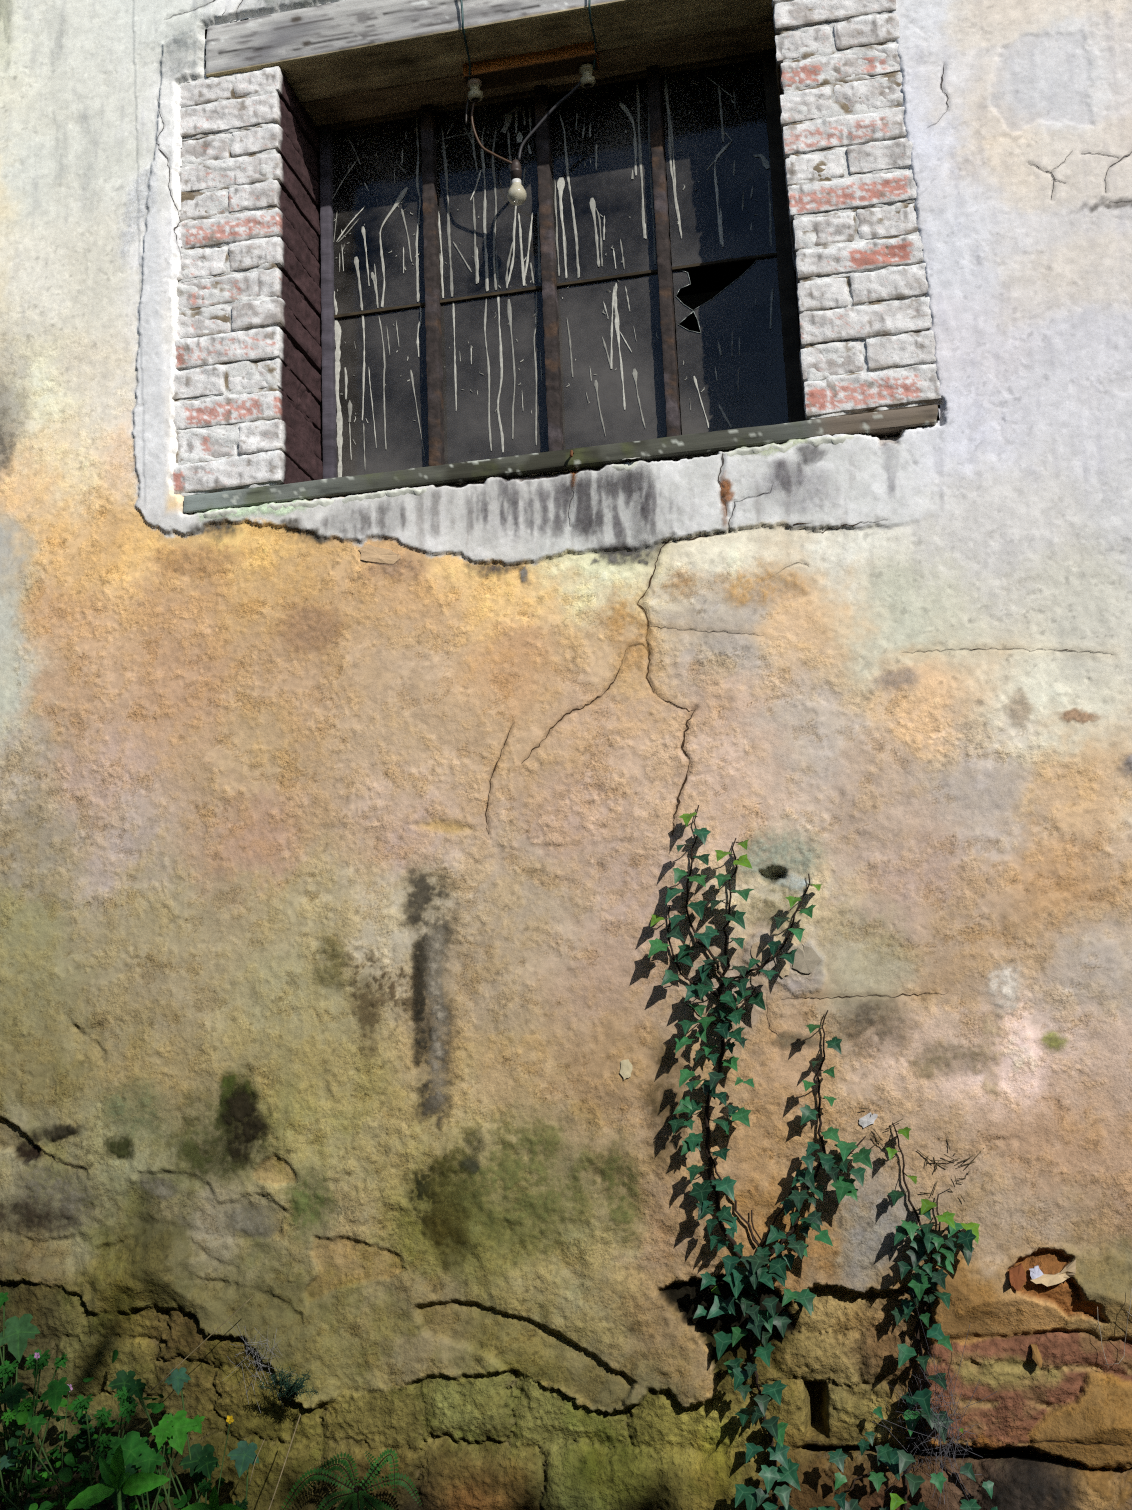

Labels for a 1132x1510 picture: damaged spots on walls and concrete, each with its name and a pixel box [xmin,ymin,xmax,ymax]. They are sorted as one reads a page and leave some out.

crack [1031,152,1132,203]
damp [763,439,823,489]
damp [288,519,326,543]
damp [481,471,656,564]
crack [776,519,888,574]
crack [485,453,773,836]
damp [322,870,453,1127]
spalling [0,1117,40,1164]
flaking render [89,1153,298,1245]
flaking render [302,1235,408,1306]
flaking render [412,1298,639,1413]
spalling [917,1249,1132,1449]